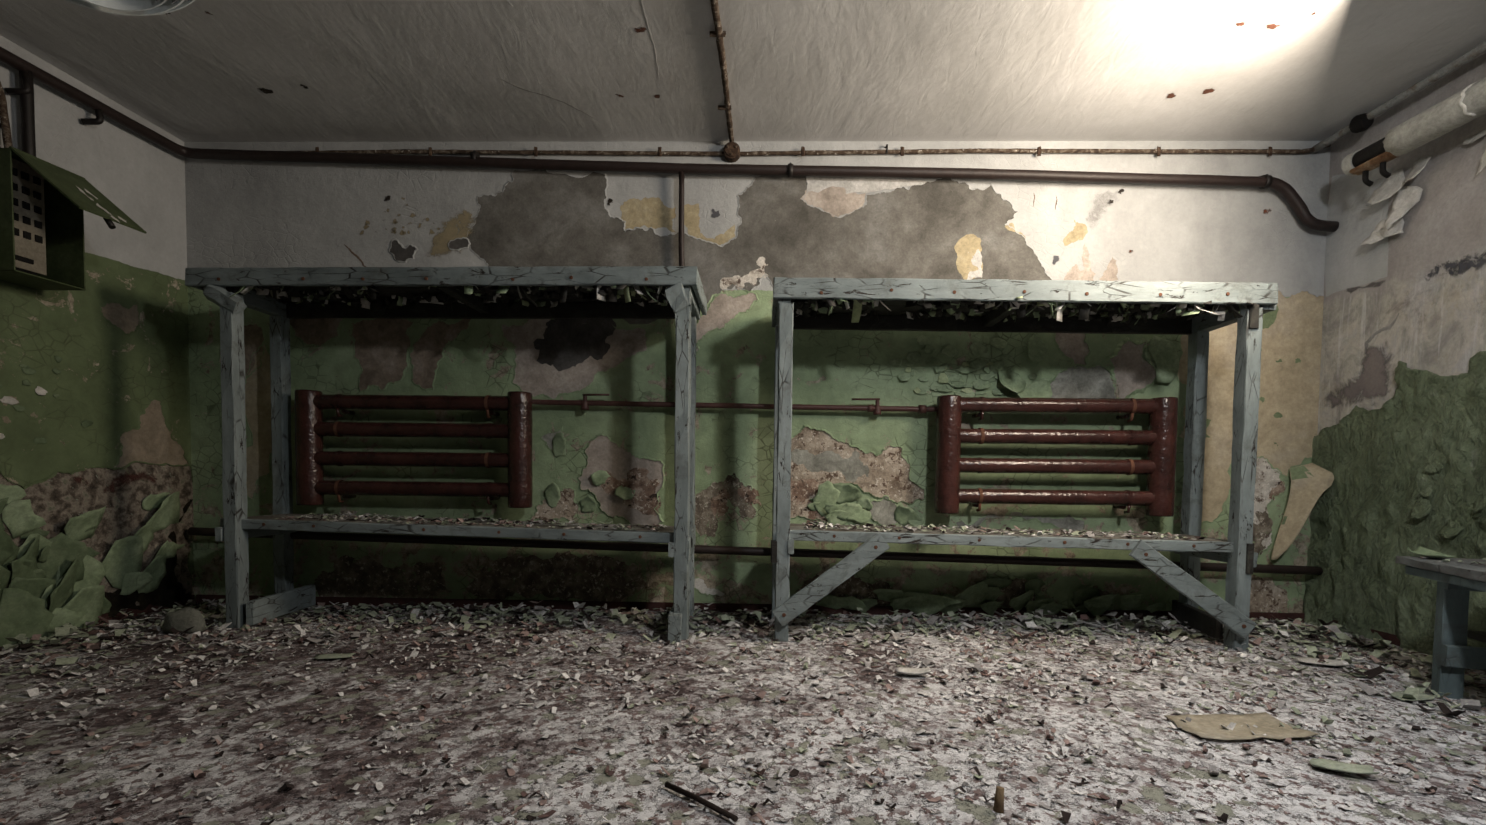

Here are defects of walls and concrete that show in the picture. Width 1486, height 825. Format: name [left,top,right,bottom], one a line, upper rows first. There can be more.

peeling [226,169,1256,527]
peeling [0,356,62,439]
peeling [0,398,194,646]
peeling [695,471,773,539]
peeling [955,511,1086,531]
peeling [1249,289,1486,656]
peeling [463,550,649,602]
peeling [694,577,730,598]
peeling [791,572,821,597]
peeling [813,573,1167,616]